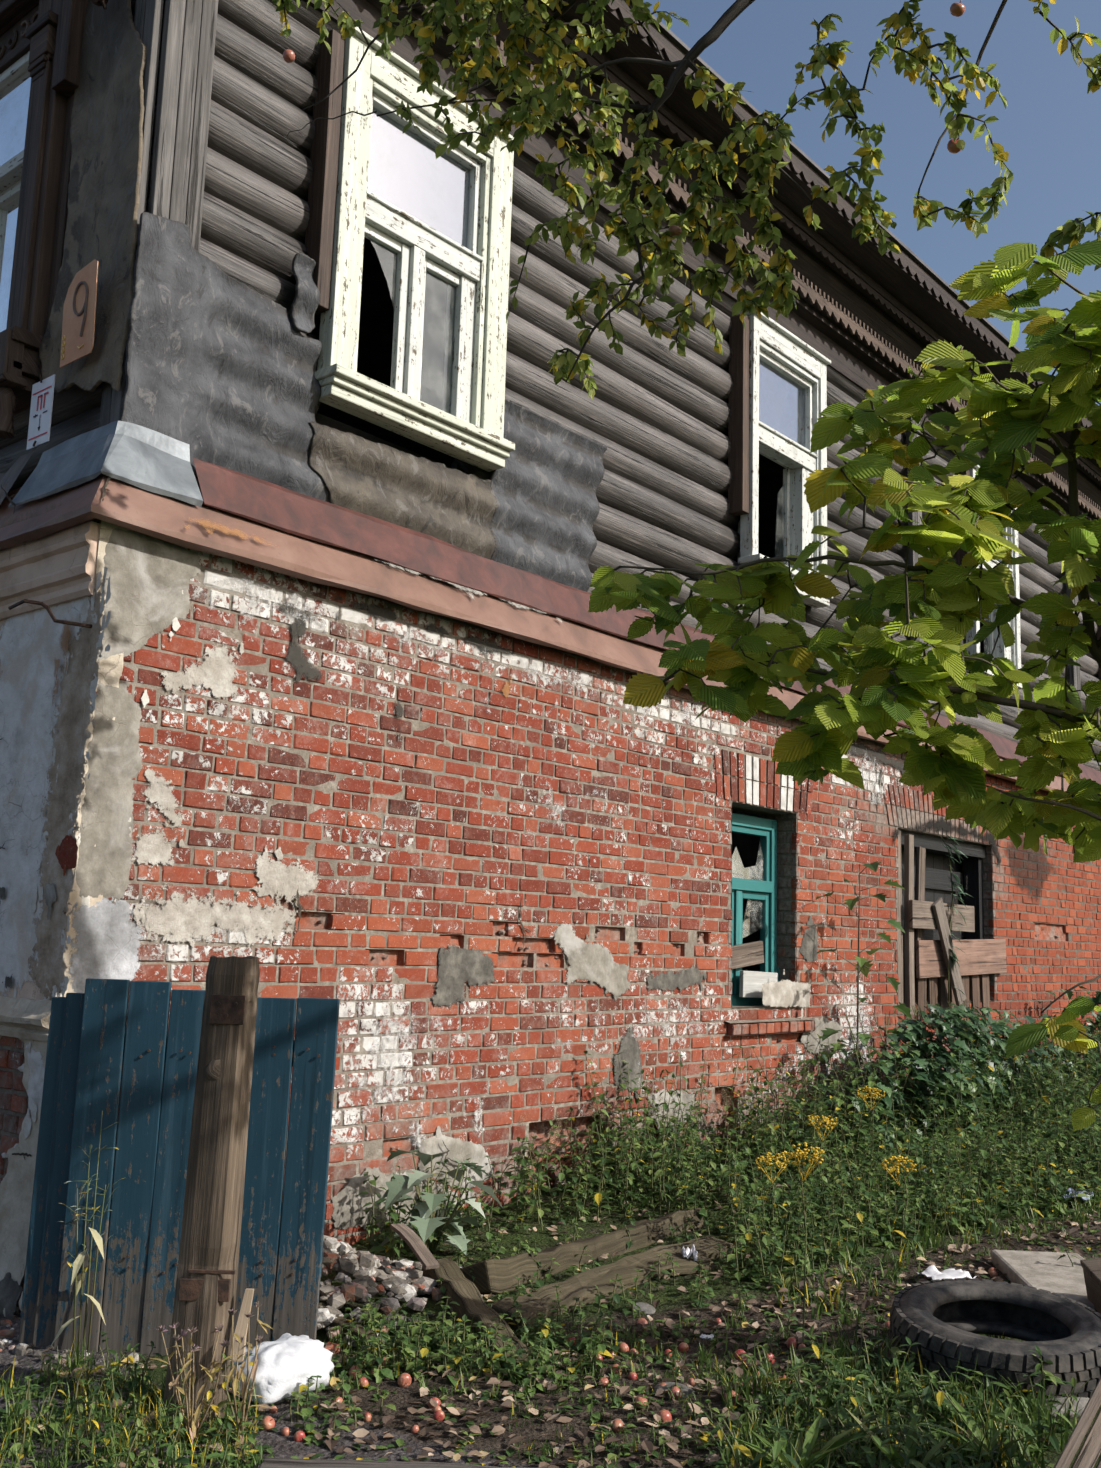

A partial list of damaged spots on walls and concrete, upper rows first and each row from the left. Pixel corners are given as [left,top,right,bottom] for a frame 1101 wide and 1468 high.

water stain [241,583,512,666]
peeling [0,528,201,1000]
peeling [1,1042,45,1158]
water stain [358,1016,441,1115]